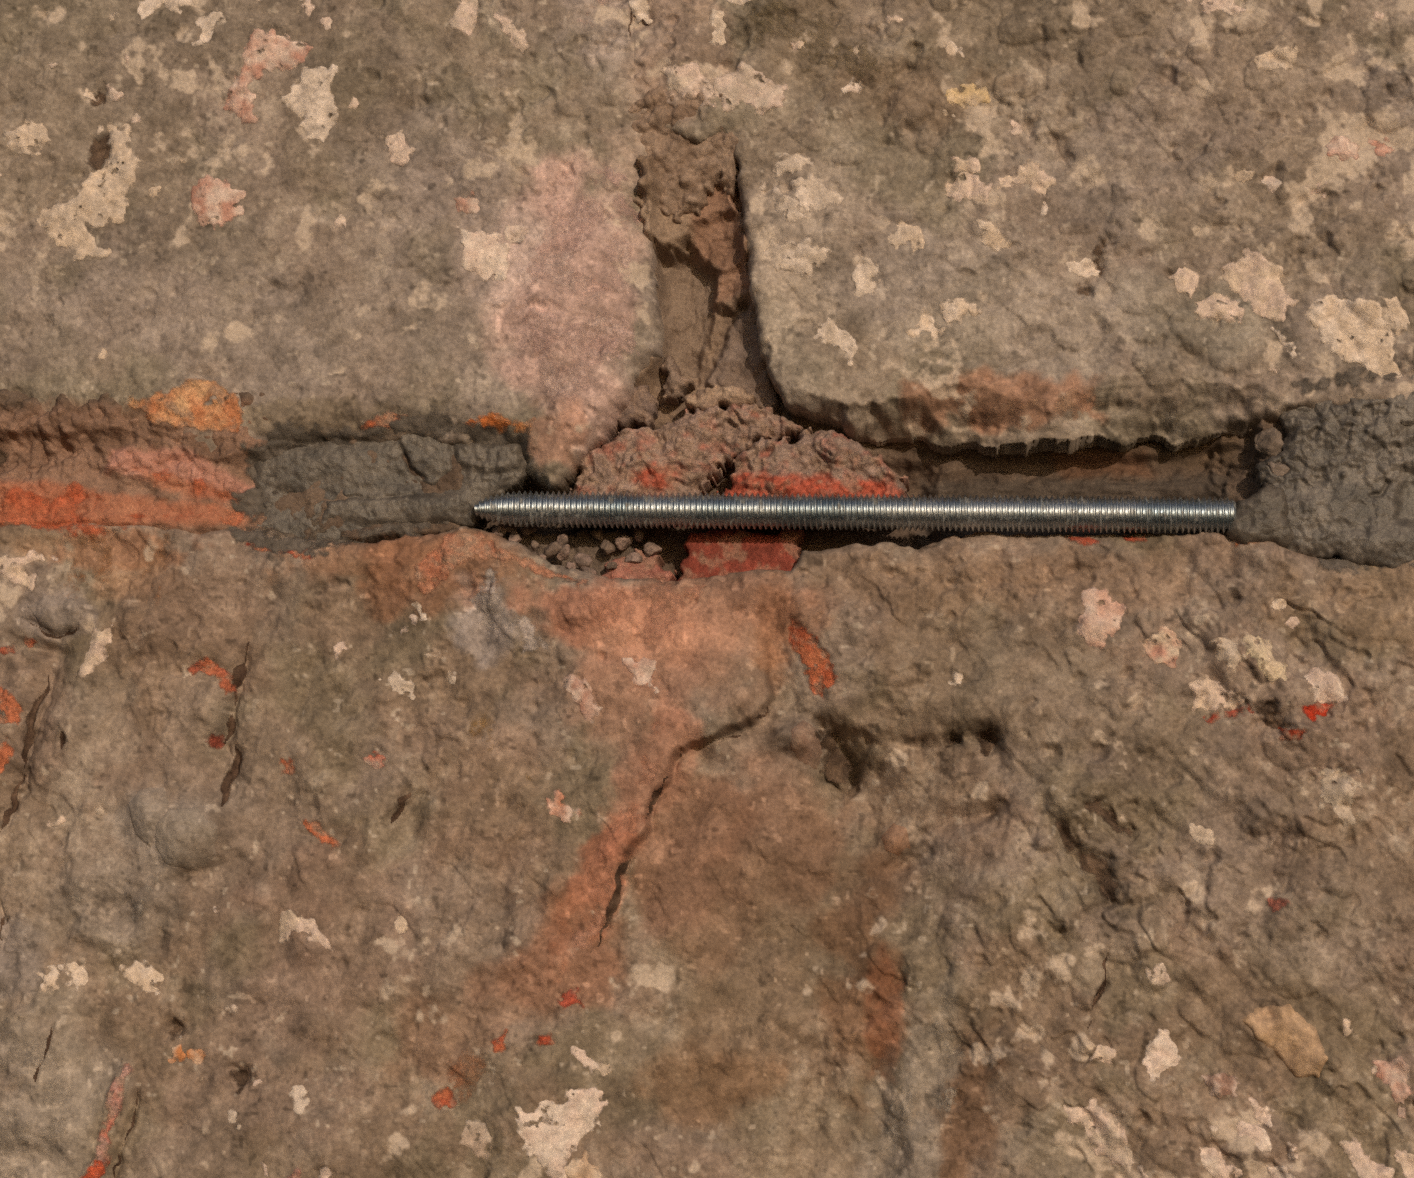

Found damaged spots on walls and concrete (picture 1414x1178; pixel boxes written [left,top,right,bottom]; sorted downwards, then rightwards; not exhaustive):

spalling [466,412,535,434]
spalling [1069,536,1098,546]